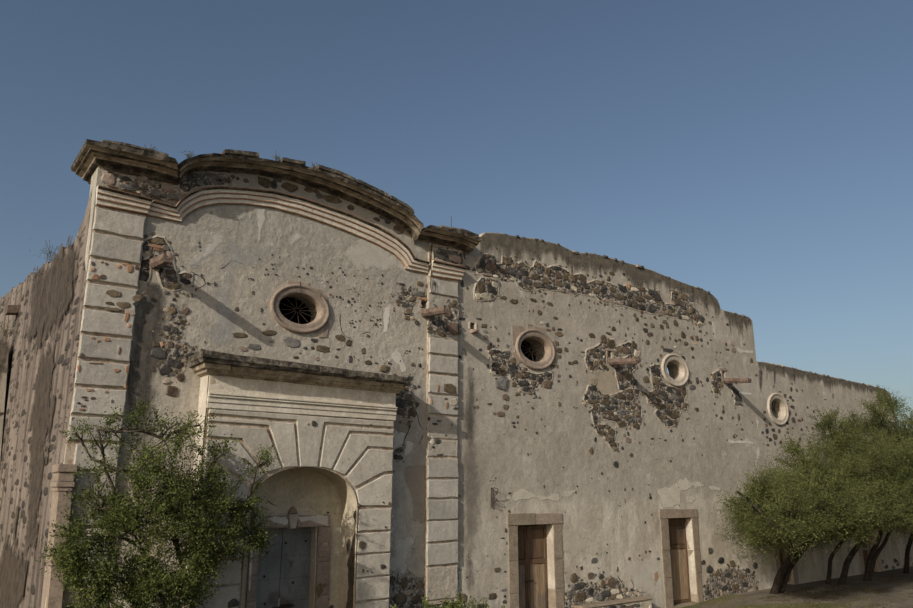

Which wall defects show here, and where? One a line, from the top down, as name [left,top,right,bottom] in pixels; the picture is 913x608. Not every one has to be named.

water stain [125,283,165,445]
flaking render [90,232,216,397]
flaking render [232,323,423,462]
flaking render [326,267,465,337]
flaking render [428,417,453,456]
water stain [480,233,751,330]
flaking render [430,246,814,468]
flaking render [346,532,442,608]
flaking render [564,544,643,608]